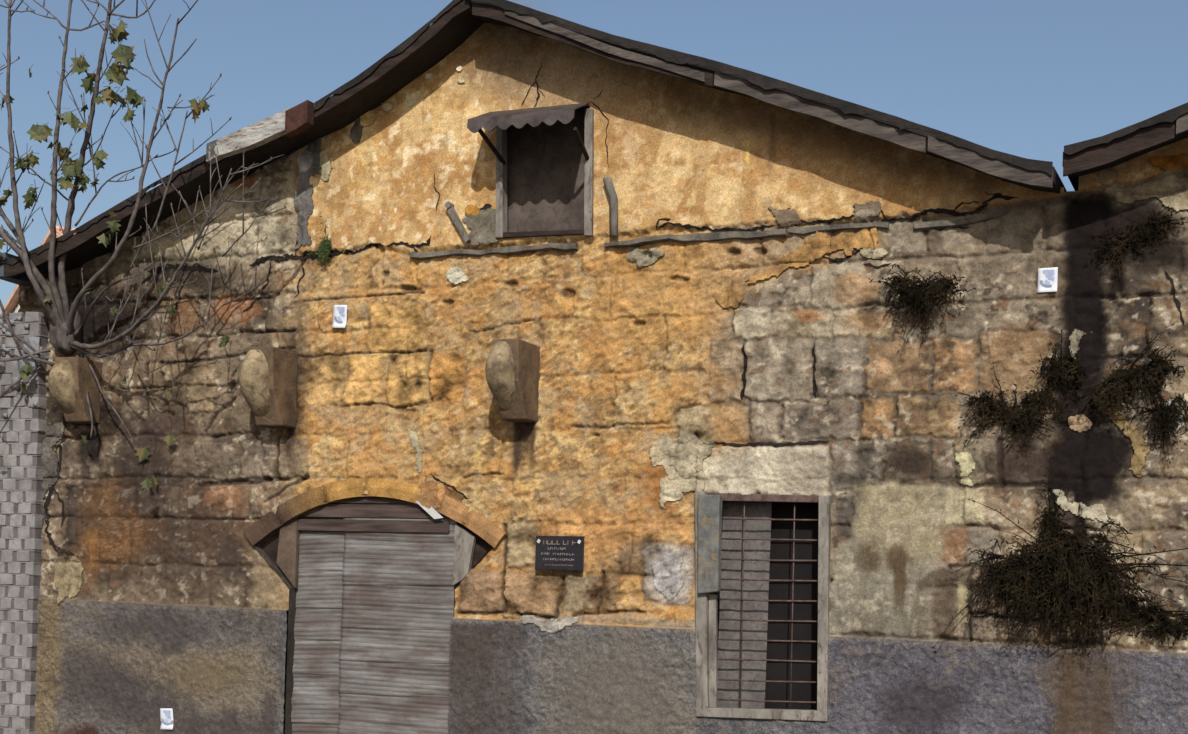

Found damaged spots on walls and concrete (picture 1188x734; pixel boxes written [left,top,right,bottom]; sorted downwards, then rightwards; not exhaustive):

spalling [293,137,333,251]
crack [656,191,1017,232]
flaking render [715,200,888,308]
crack [783,248,891,269]
spalling [1069,329,1092,358]
damp [1047,196,1130,550]
spalling [1068,415,1092,432]
spalling [1106,406,1150,477]
spalling [1165,399,1184,433]
spalling [954,452,975,486]
crack [43,424,79,557]
spalling [1053,489,1108,523]